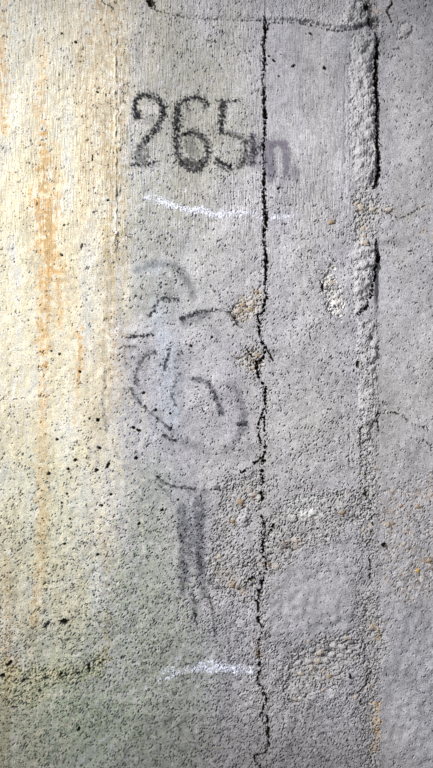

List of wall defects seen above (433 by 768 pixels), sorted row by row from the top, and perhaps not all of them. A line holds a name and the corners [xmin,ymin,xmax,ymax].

rust [35,121,59,286]
crack [147,0,393,768]